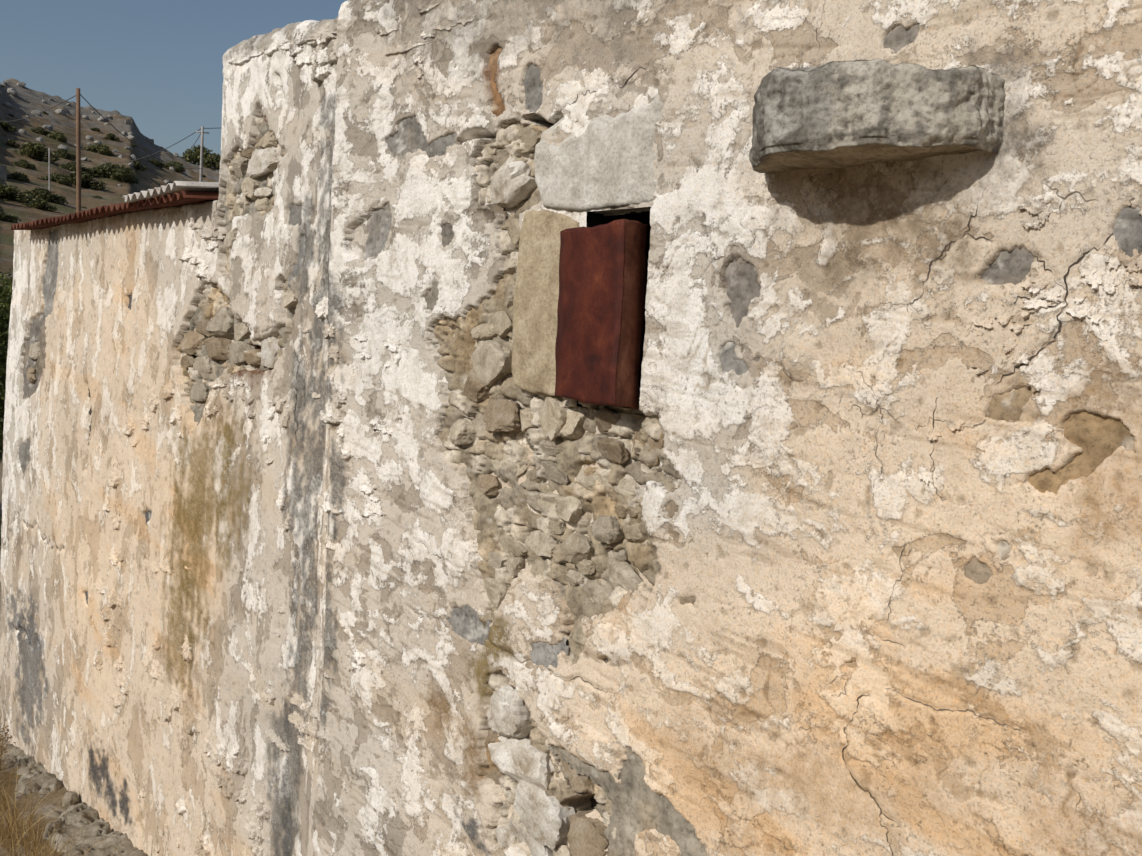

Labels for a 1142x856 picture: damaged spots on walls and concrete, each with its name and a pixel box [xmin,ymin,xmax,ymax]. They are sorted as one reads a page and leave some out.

spalling [122,106,352,466]
peeling [353,331,402,367]
peeling [364,203,392,260]
spalling [425,46,681,668]
crack [907,188,993,311]
crack [997,233,1113,383]
damp [164,420,249,689]
peeling [274,489,290,533]
peeling [1028,411,1136,494]
spalling [485,673,709,856]
crack [789,676,1021,856]